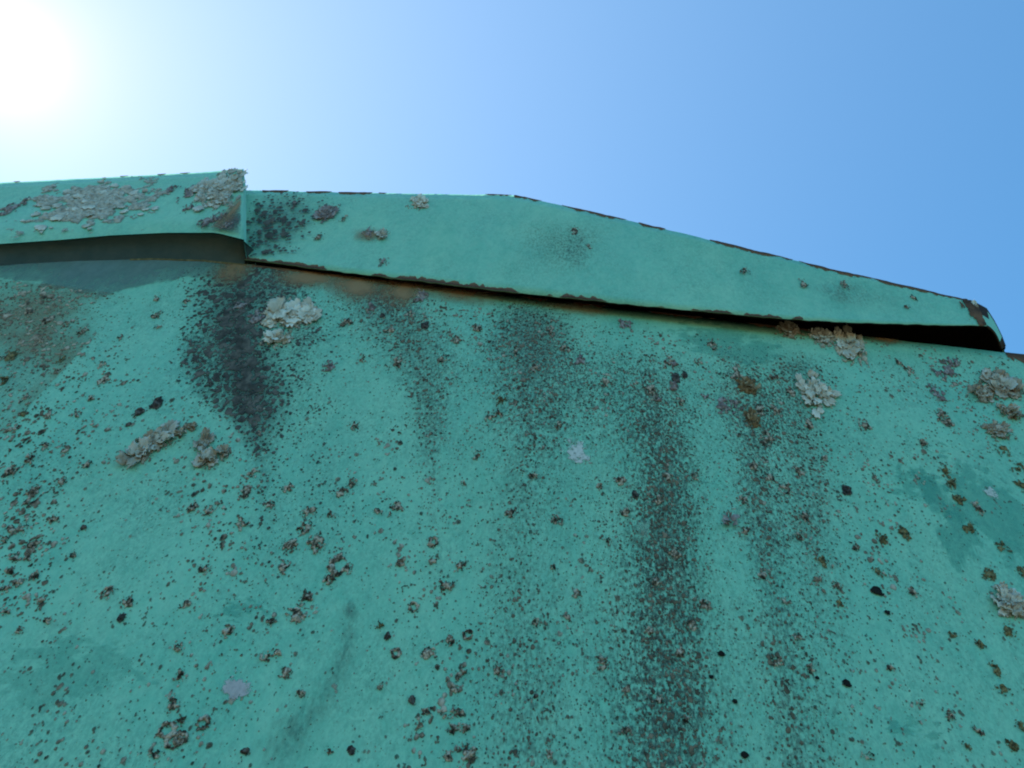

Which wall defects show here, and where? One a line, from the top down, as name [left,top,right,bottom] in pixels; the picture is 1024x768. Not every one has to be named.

corrosion [563,205,626,220]
corrosion [219,256,607,311]
corrosion [711,240,986,326]
leakage [0,191,1001,768]